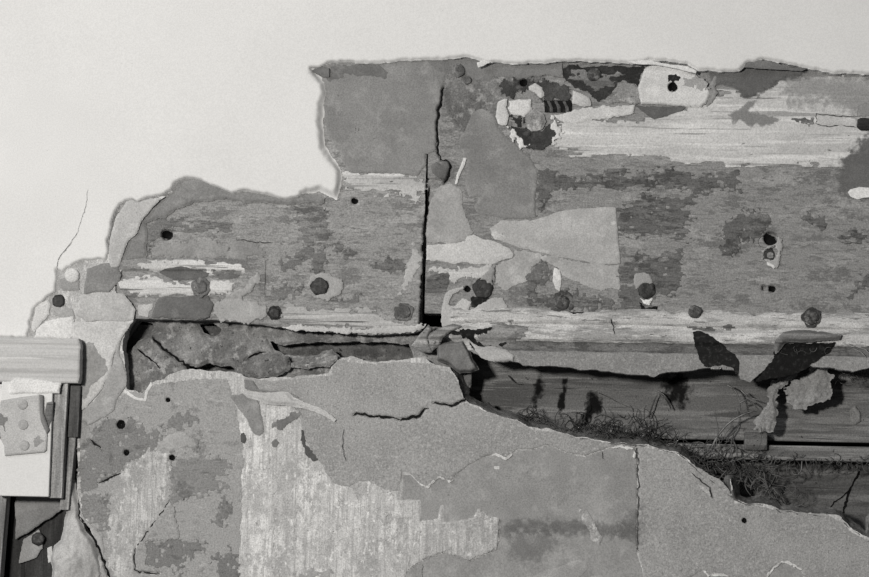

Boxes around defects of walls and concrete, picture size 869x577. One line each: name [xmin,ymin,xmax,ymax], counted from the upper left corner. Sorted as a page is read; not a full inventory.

peeling [312,64,387,82]
peeling [342,58,869,342]
peeling [8,378,62,394]
flaking render [31,178,869,577]
crack [342,399,466,460]
peeling [15,497,61,563]
crack [633,448,641,550]